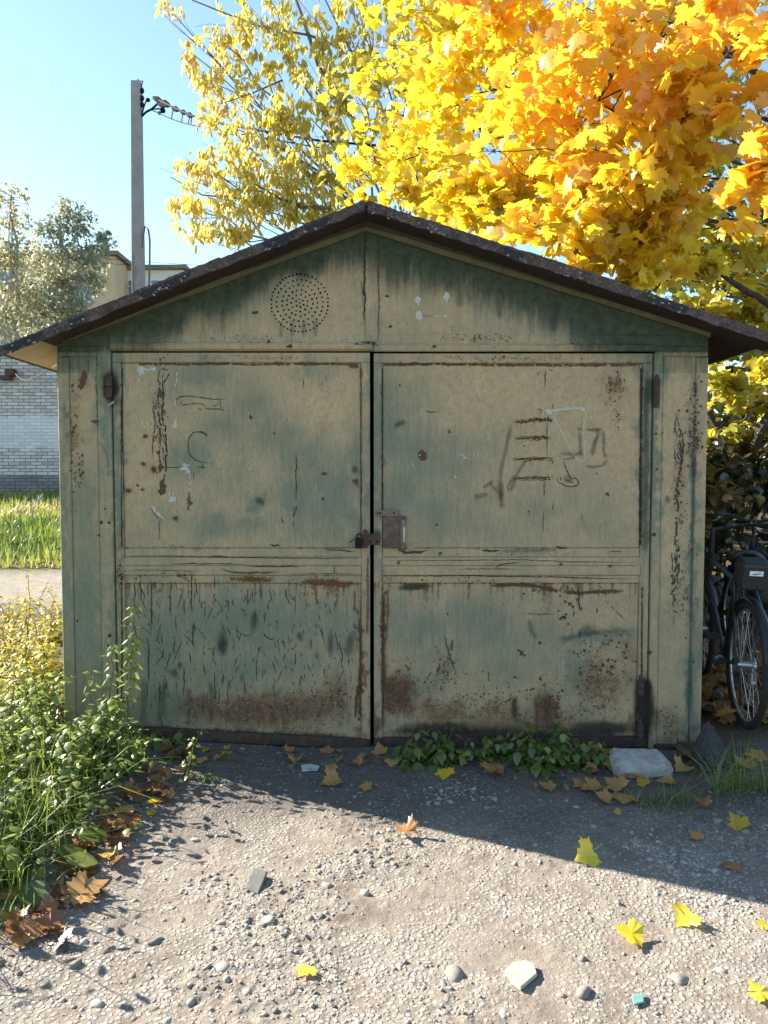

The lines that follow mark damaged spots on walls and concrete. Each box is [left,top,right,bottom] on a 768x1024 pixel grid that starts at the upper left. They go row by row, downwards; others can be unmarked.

rust [77,370,87,390]
peeling [140,373,224,503]
rust [458,576,622,625]
rust [162,556,426,735]
rust [513,674,563,723]